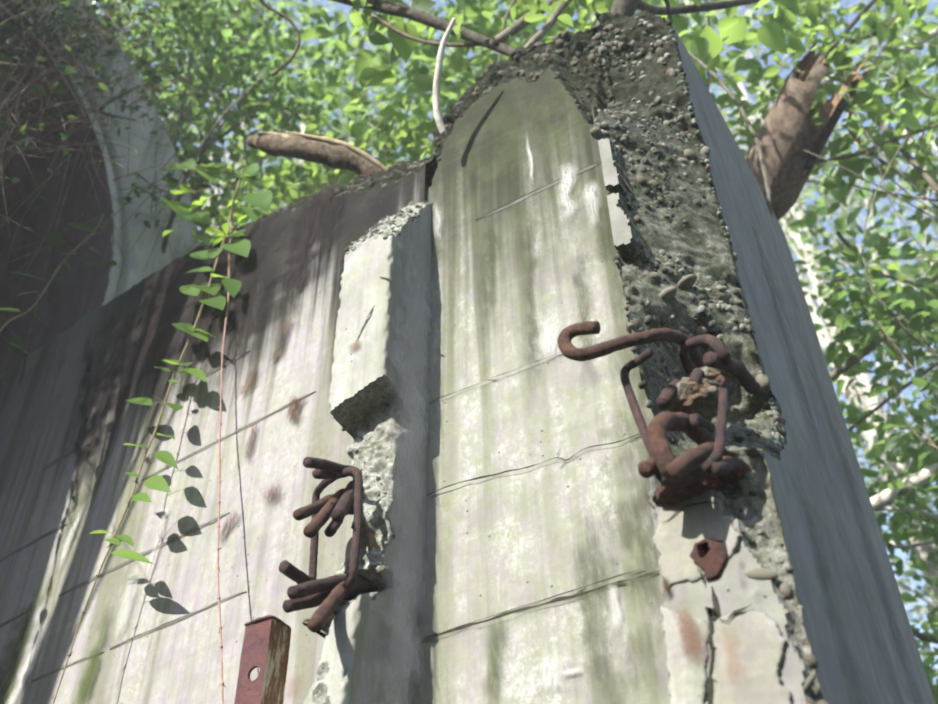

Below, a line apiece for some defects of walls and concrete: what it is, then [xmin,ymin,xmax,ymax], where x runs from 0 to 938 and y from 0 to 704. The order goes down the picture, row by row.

efflorescence [561,168,573,212]
efflorescence [585,186,596,211]
leakage [73,184,342,488]
spalling [228,9,829,704]
leakage [531,320,556,353]
corrosion [690,538,728,581]
crack [696,568,752,704]